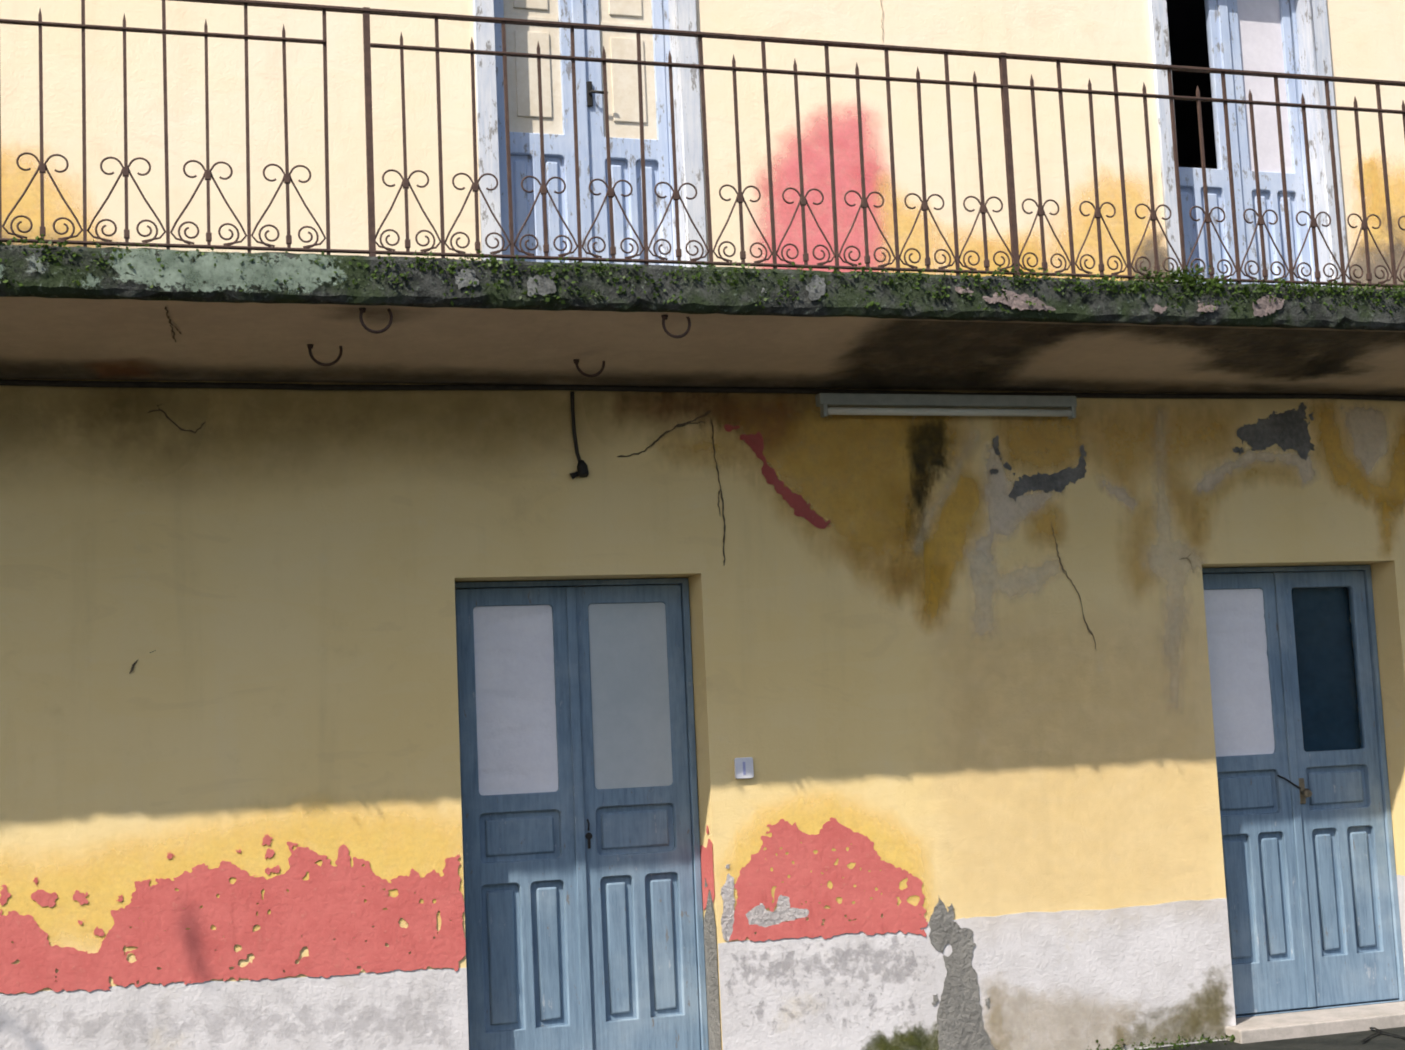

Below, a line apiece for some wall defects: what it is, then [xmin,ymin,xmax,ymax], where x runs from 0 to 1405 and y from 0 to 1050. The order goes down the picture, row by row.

crack [617,411,726,565]
peeling [723,424,831,529]
leakage [369,320,1405,617]
flaking render [990,435,1087,502]
flaking render [1232,402,1315,460]
crack [1051,526,1097,651]
peeling [0,834,466,994]
peeling [701,817,996,1050]